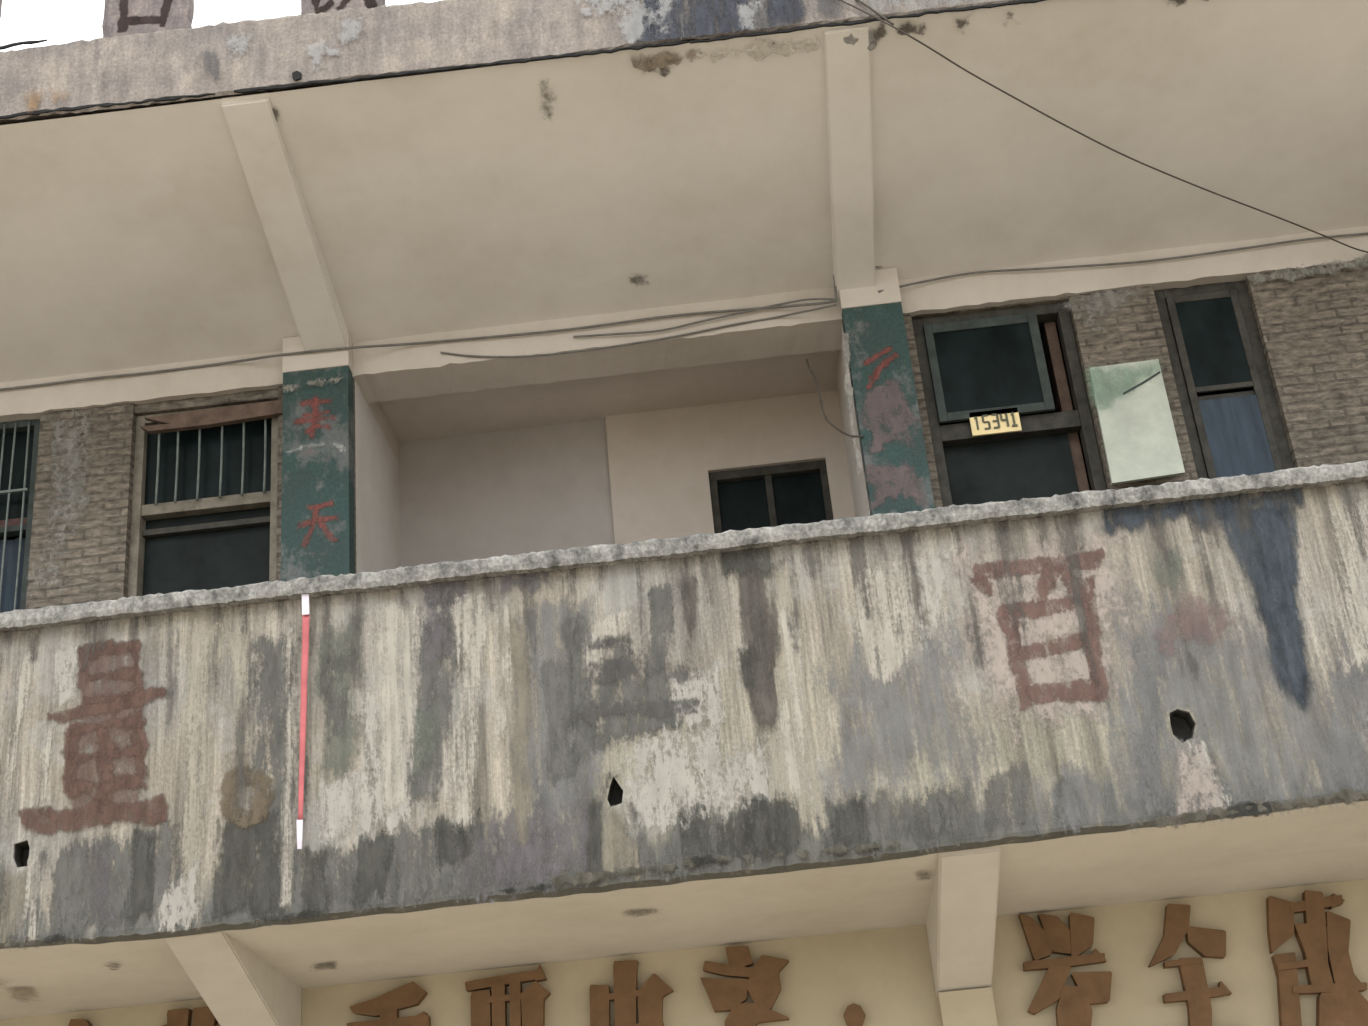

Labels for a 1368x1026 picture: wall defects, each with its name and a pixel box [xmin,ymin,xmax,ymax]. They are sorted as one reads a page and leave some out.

peeling [577,0,819,77]
water stain [635,0,841,42]
water stain [0,480,1368,943]
spalling [1136,788,1368,828]